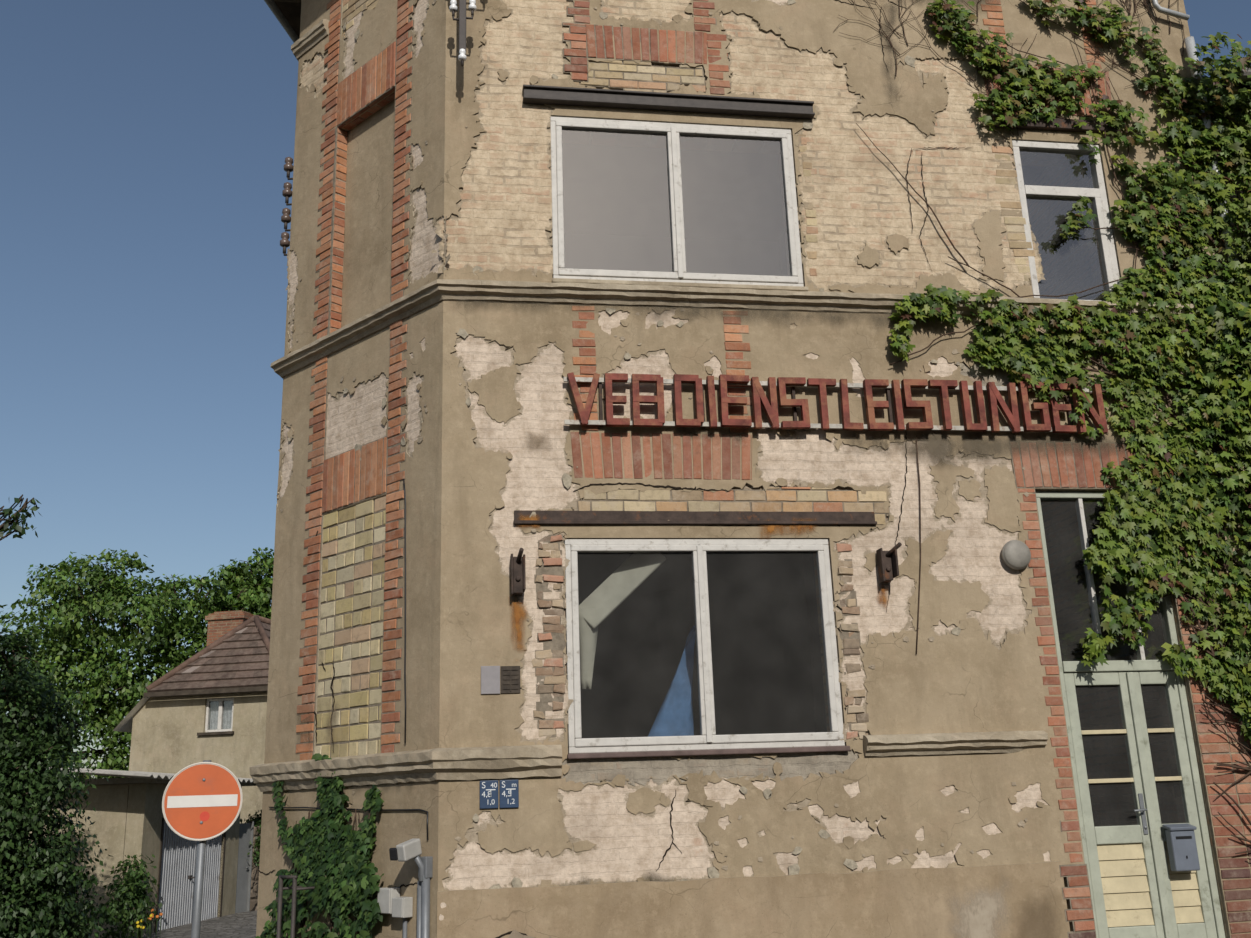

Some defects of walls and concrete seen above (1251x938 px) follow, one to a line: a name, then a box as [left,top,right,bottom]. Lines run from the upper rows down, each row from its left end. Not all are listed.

peeling [299,4,368,98]
peeling [405,0,706,283]
peeling [594,0,1046,295]
peeling [326,338,428,461]
peeling [596,304,692,421]
corrosion [512,601,526,648]
peeling [439,329,1031,921]
crack [304,656,335,753]
crack [656,794,682,871]
peeling [1008,782,1048,827]